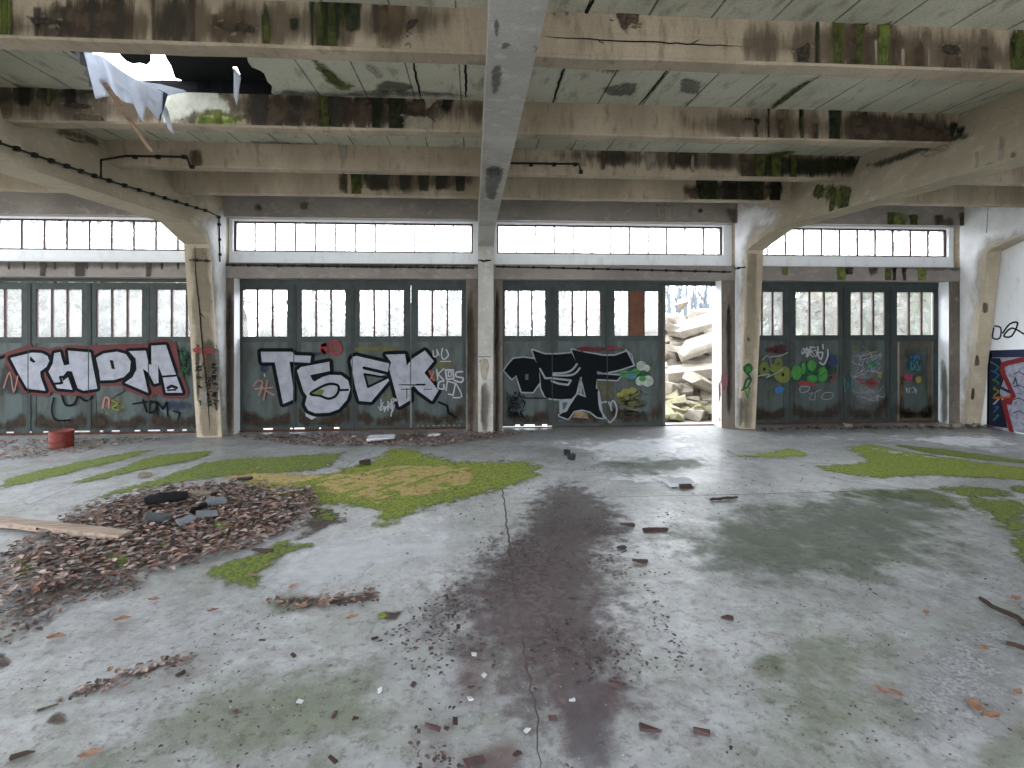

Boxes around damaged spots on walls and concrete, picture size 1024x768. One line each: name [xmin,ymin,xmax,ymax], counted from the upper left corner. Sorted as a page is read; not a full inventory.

leakage [11,0,318,45]
leakage [369,4,431,42]
crack [546,0,742,47]
leakage [744,27,778,61]
leakage [792,22,1019,70]
crack [553,69,564,103]
leakage [485,166,502,199]
leakage [563,150,782,223]
crack [502,489,515,590]
crack [522,633,542,768]